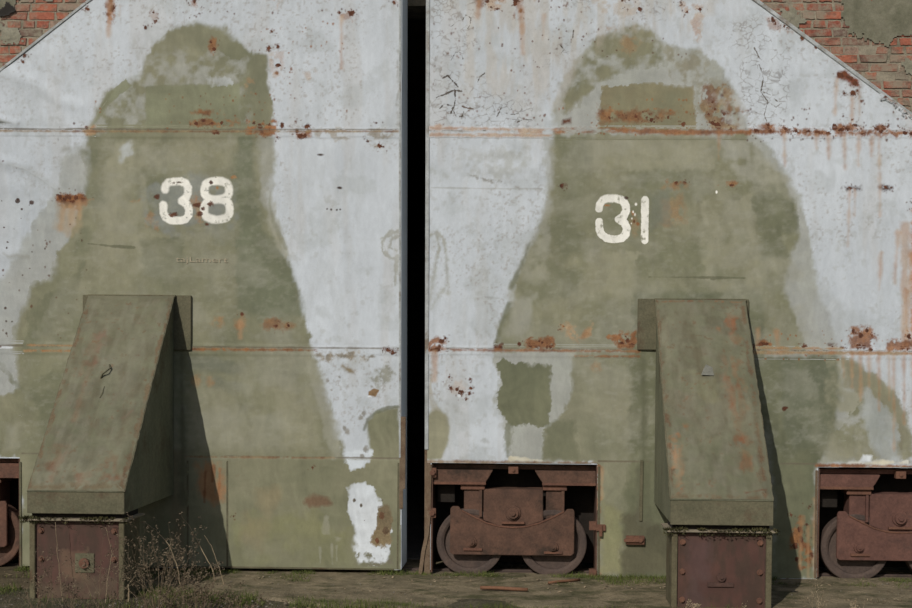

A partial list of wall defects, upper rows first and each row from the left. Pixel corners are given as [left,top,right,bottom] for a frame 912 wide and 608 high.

peeling [0,0,24,45]
peeling [841,0,912,47]
crack [429,0,541,134]
corrosion [429,0,912,249]
corrosion [51,189,94,239]
corrosion [428,320,641,402]
corrosion [656,198,912,500]
corrosion [192,458,239,508]
peeling [355,499,395,568]